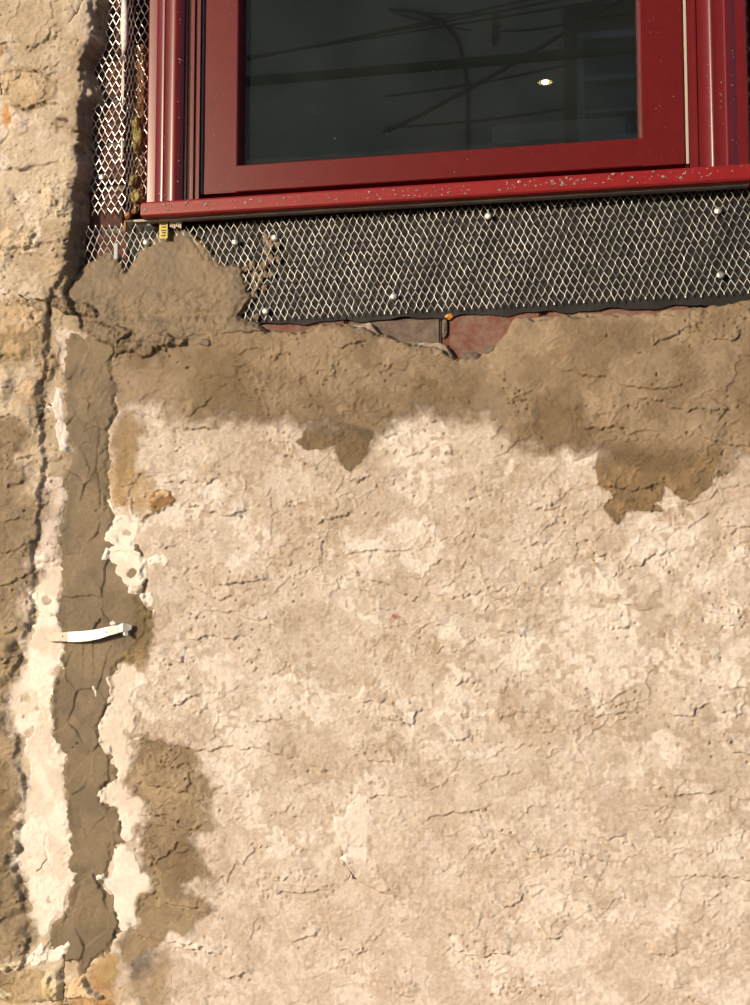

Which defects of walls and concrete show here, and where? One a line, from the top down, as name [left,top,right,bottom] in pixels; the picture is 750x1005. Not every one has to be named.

spalling [259,305,689,359]
peeling [47,387,70,452]
peeling [102,489,176,619]
peeling [0,477,106,1005]
peeling [96,662,161,932]